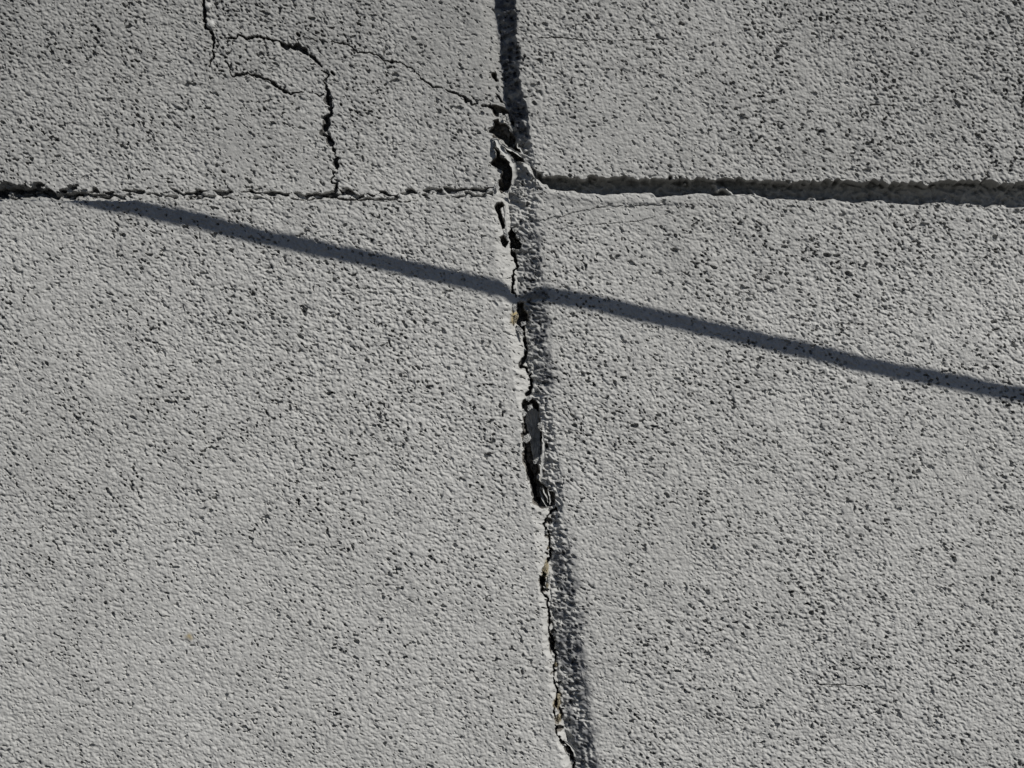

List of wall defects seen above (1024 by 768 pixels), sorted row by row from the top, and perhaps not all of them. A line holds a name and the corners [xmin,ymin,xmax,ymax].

crack [0,184,149,199]
crack [174,0,496,203]
crack [538,508,577,768]